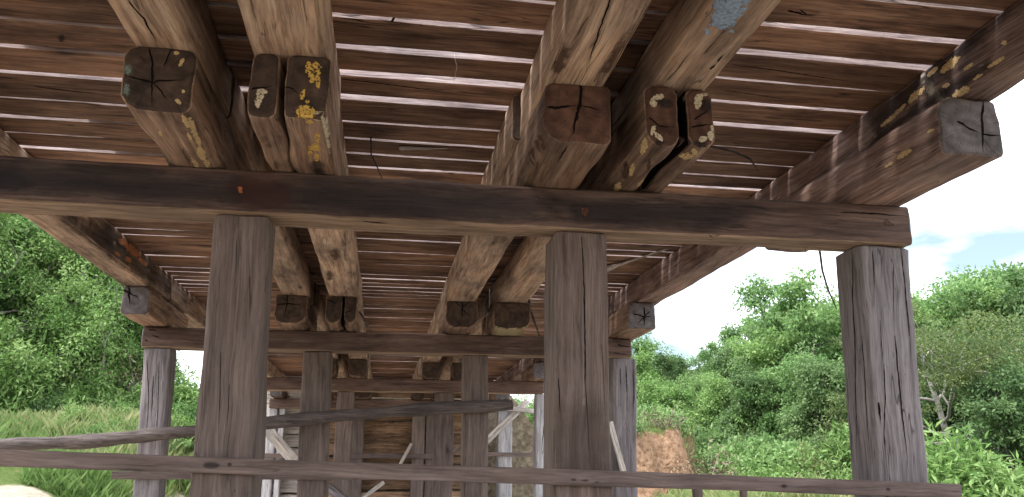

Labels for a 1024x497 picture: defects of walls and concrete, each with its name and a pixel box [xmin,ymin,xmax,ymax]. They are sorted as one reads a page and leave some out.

crack [127,0,175,110]
crack [547,0,611,163]
crack [642,29,877,189]
crack [957,102,999,155]
crack [581,236,650,456]